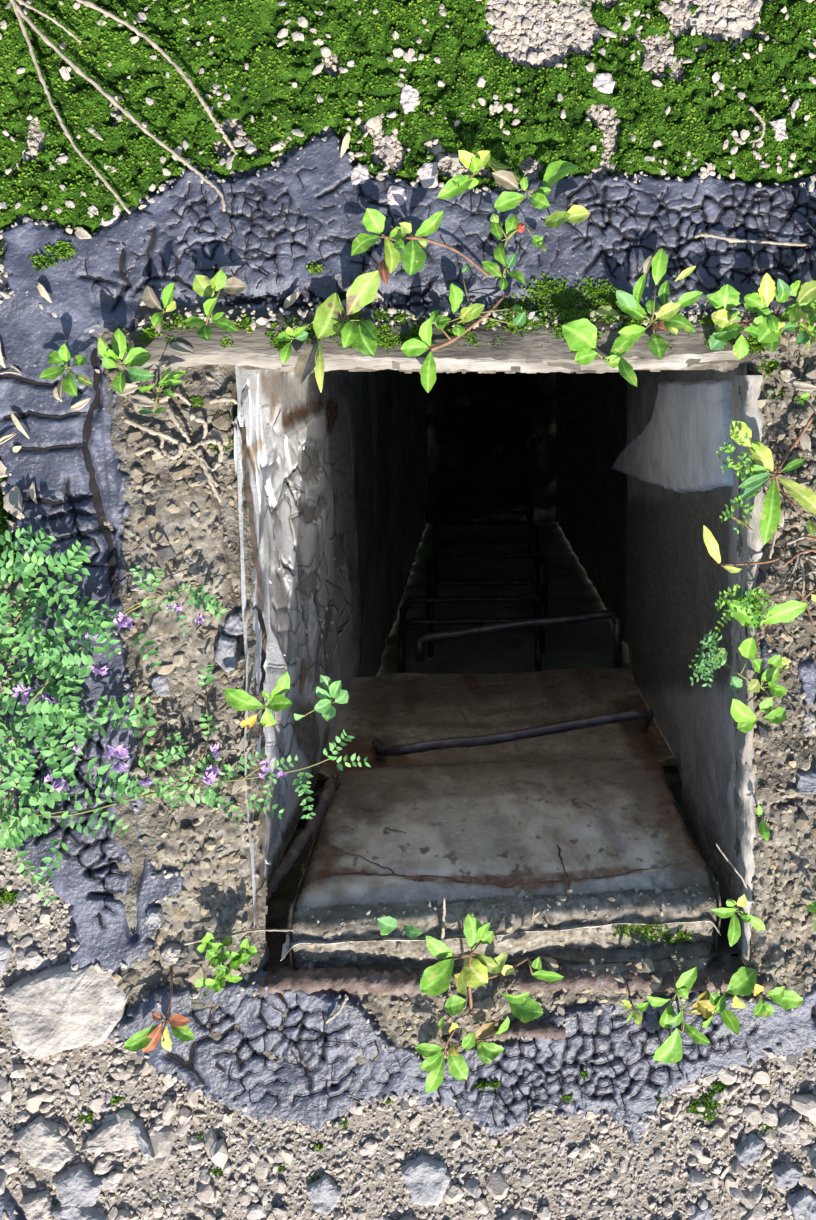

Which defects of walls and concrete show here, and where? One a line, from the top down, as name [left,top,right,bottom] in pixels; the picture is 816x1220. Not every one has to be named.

crack [81,164,816,312]
corrosion [262,375,338,433]
crack [0,349,119,597]
crack [207,386,357,890]
corrosion [266,739,641,904]
crack [314,783,690,889]
corrosion [245,966,445,998]
corrosion [488,966,788,996]
crack [166,992,816,1127]